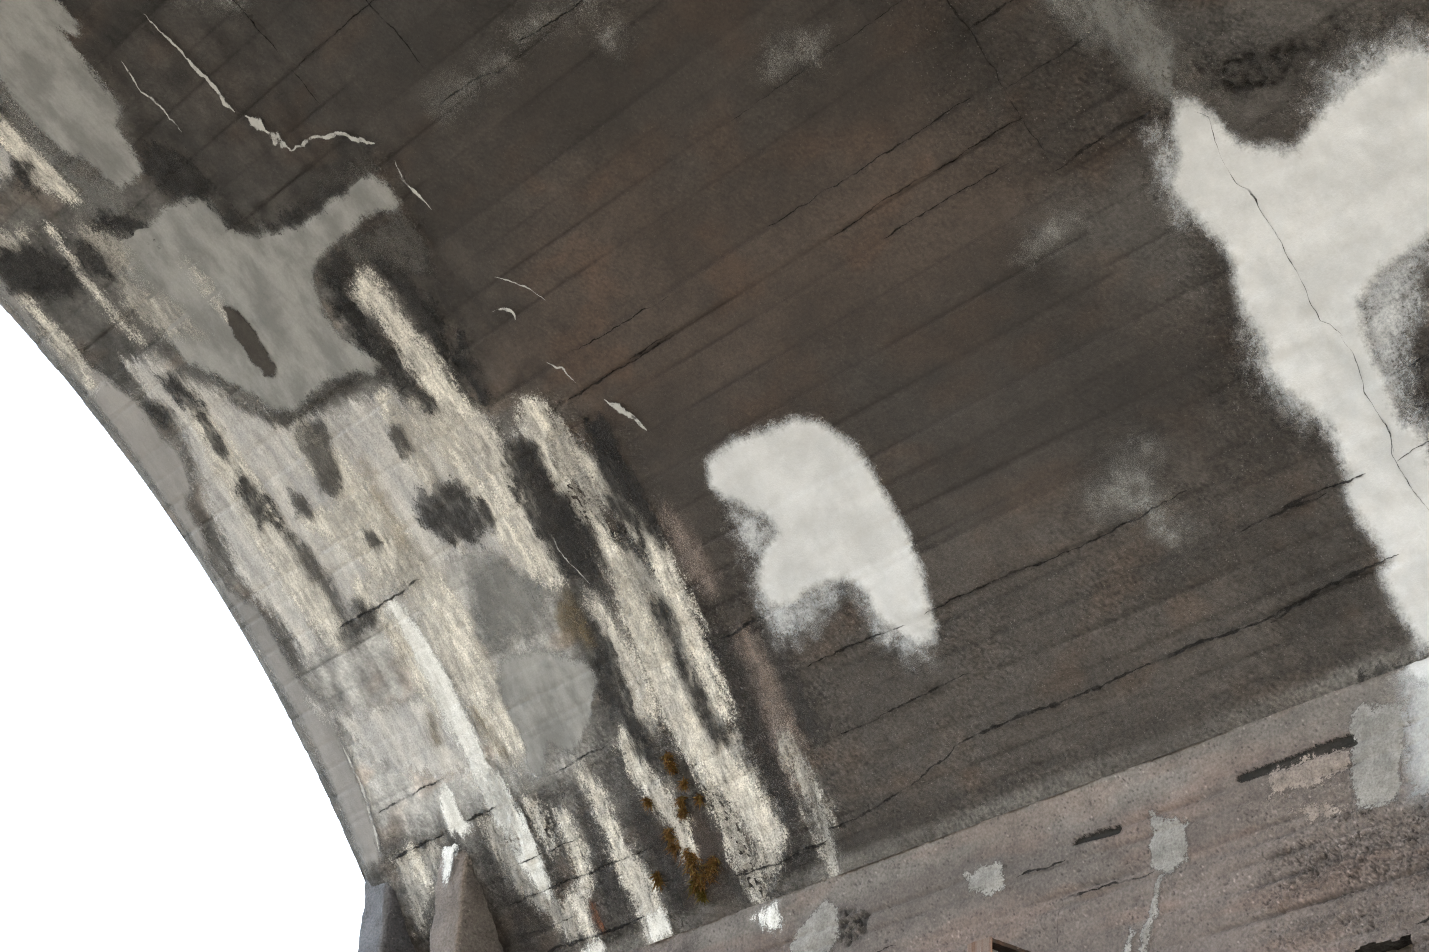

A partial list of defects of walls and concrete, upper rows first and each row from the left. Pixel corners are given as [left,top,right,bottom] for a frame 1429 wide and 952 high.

crack [122,62,180,130]
crack [144,0,432,210]
crack [441,0,582,104]
leakage [227,266,842,947]